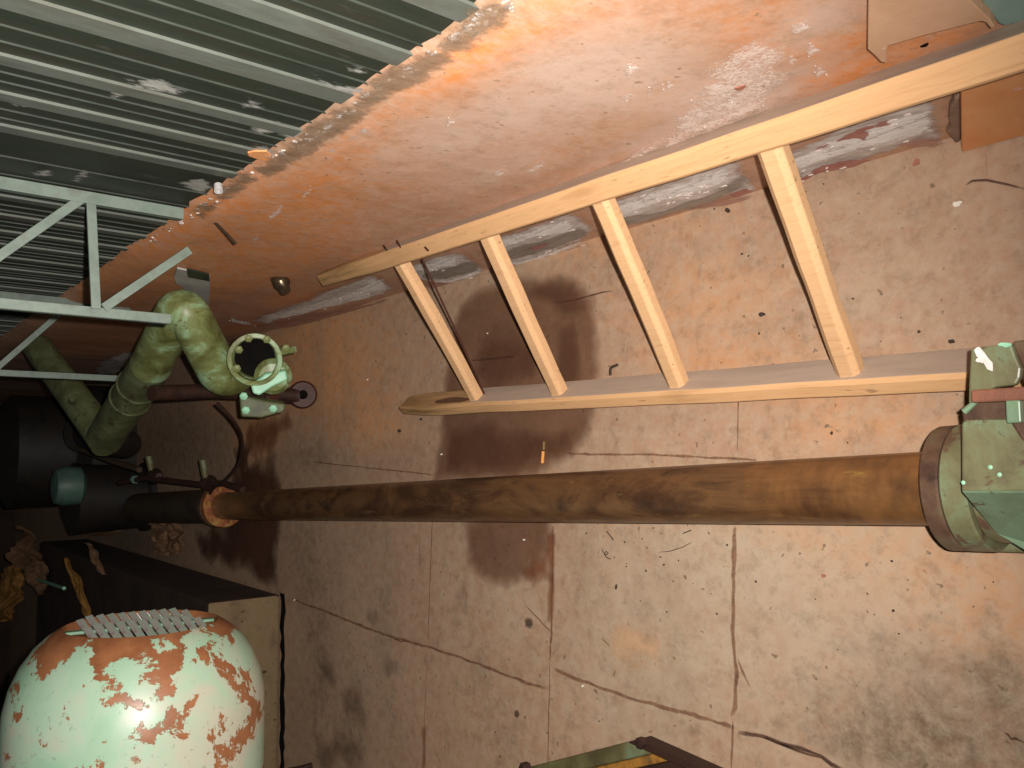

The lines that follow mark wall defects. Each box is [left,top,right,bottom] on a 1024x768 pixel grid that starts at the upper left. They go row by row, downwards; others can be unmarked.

peeling [133,79,181,94]
spalling [149,0,515,242]
leakage [625,43,827,161]
peeling [229,277,393,329]
leakage [448,366,464,392]
leakage [456,292,546,388]
leakage [524,284,609,382]
leakage [439,408,588,475]
leakage [471,522,545,577]
crack [295,529,840,768]